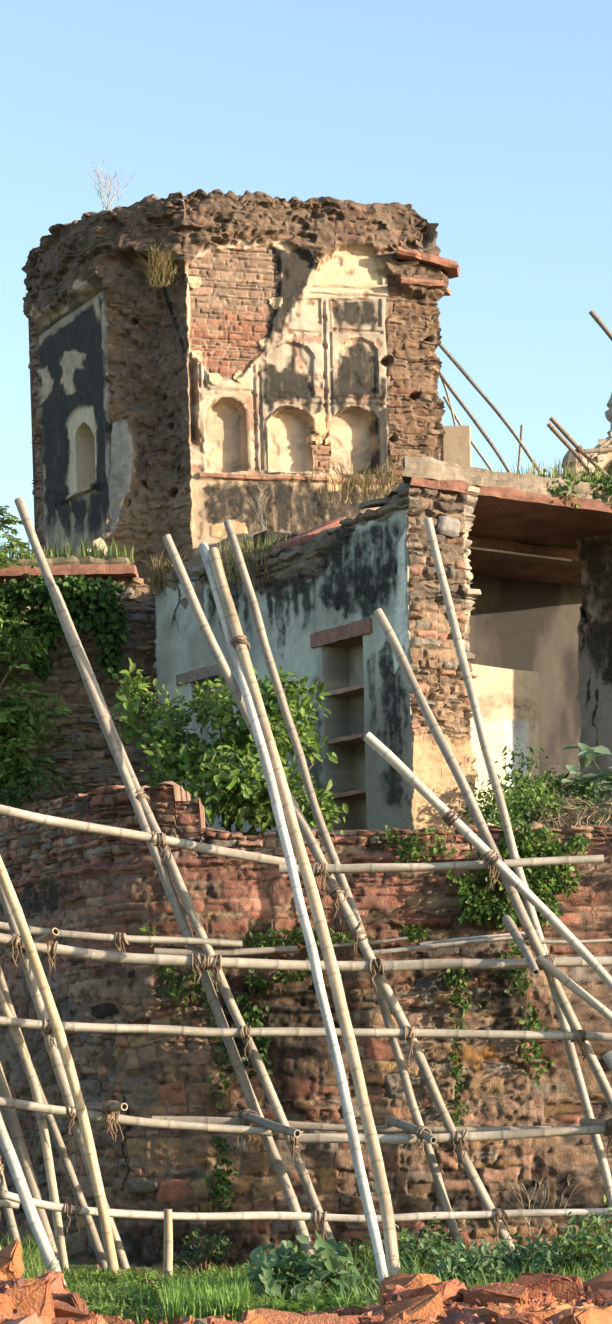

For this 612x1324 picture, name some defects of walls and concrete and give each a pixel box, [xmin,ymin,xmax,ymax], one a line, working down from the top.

peeling [37,350,86,405]
spalling [71,242,283,610]
water stain [204,247,402,644]
water stain [578,534,612,684]
water stain [367,642,409,805]